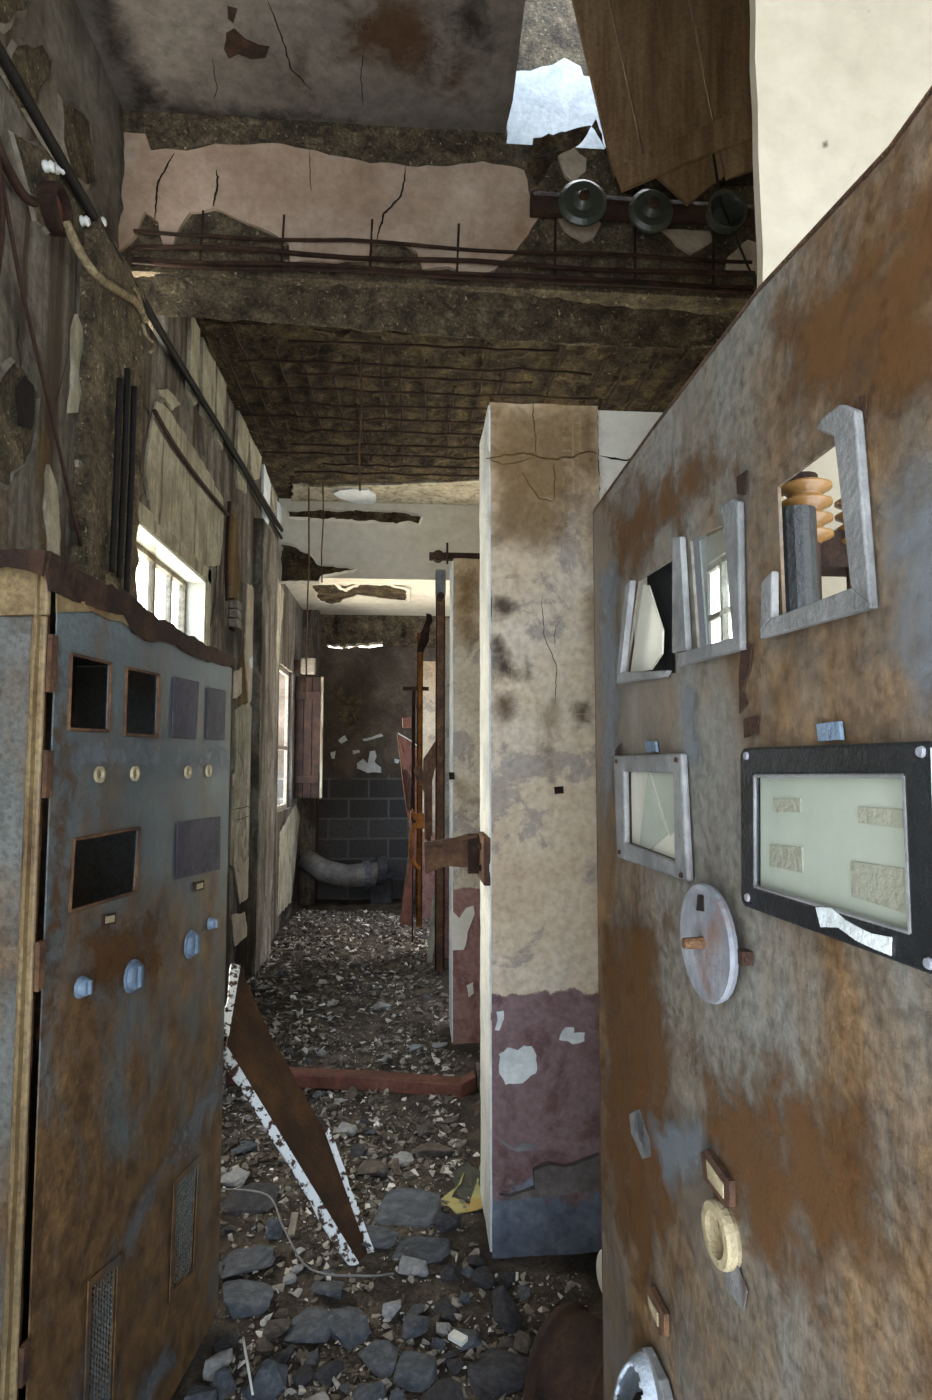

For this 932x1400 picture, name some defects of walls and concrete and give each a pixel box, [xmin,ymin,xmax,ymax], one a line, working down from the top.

peeling [224,6,269,60]
crack [267,0,311,90]
spalling [118,58,755,693]
crack [486,403,535,462]
crack [563,448,630,500]
flaking render [330,734,400,773]
flaking render [449,906,475,950]
peeling [495,1011,504,1031]
peeling [559,1027,585,1044]
peeling [499,1045,537,1085]